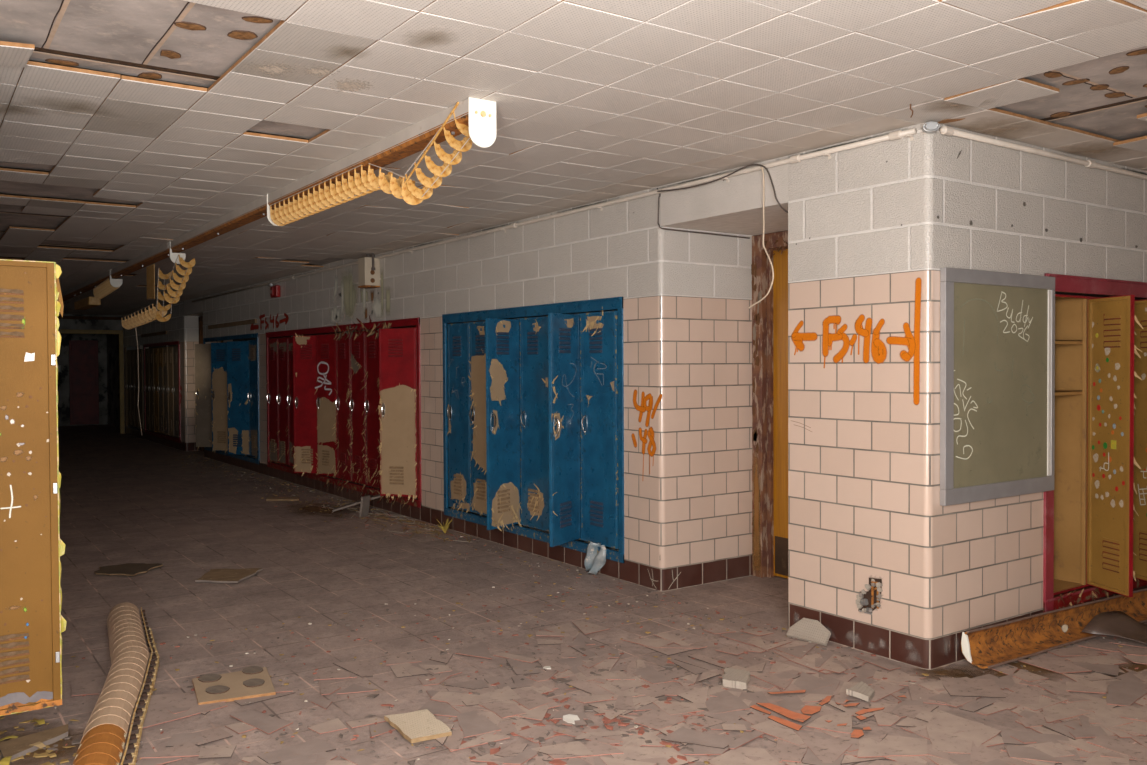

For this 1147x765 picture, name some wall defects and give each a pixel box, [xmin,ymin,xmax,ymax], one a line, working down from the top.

peeling [0,0,281,87]
peeling [247,119,327,139]
peeling [996,46,1147,141]
spalling [856,578,883,615]